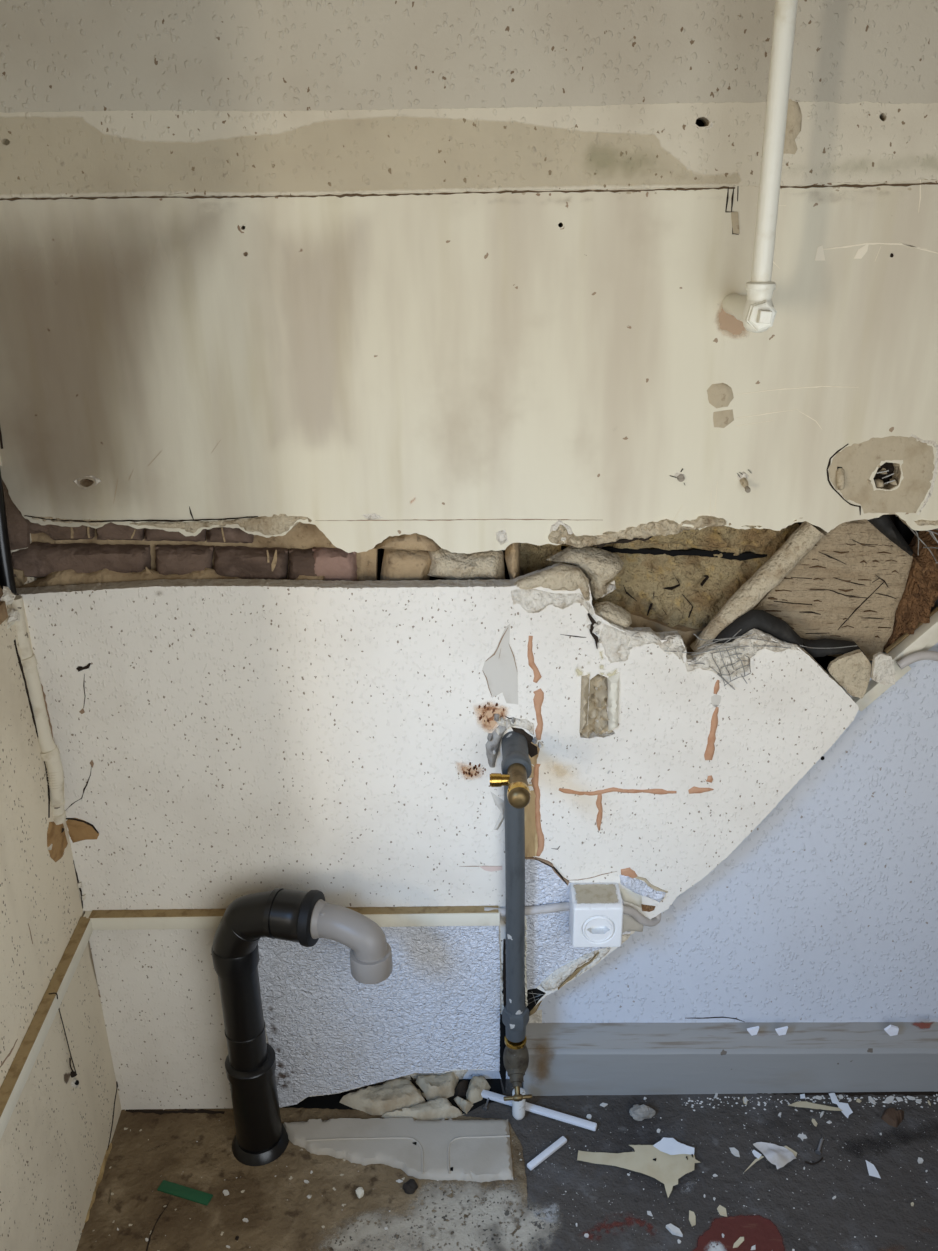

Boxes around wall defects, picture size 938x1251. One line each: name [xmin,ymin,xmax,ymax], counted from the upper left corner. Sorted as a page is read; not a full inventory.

peeling [783,99,802,154]
peeling [707,383,734,428]
peeling [826,434,938,526]
spalling [11,514,805,677]
flaking render [827,649,895,699]
spalling [485,714,543,768]
peeling [47,818,99,863]
spalling [283,1014,506,1120]